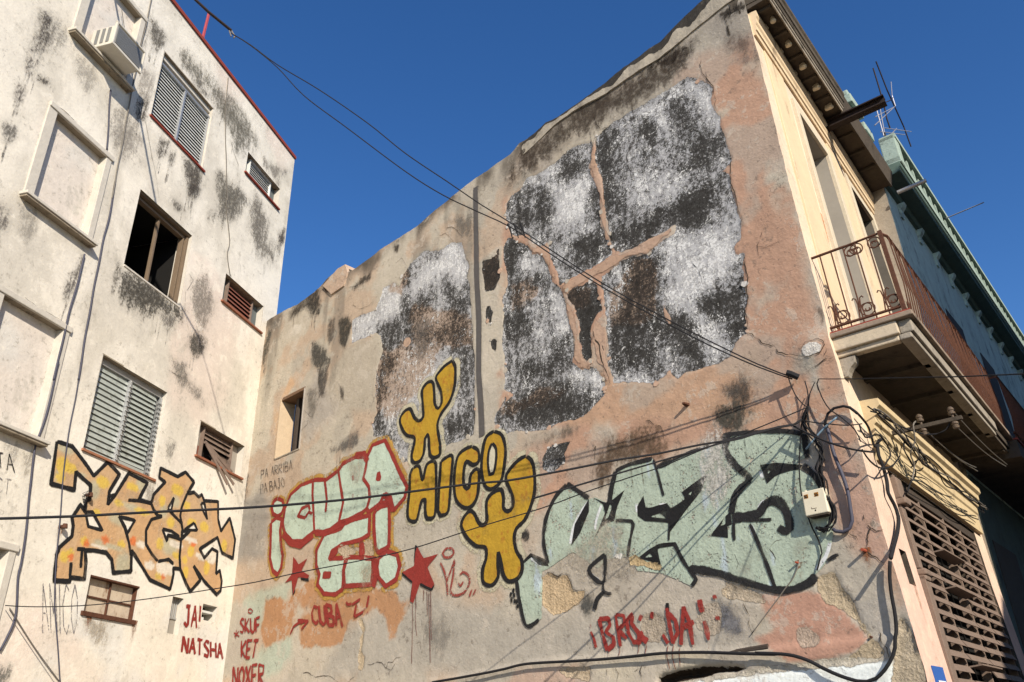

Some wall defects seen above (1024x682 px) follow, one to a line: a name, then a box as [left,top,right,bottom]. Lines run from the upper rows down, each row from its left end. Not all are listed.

damp [26,11,63,84]
damp [3,85,24,141]
damp [509,47,692,181]
damp [114,267,212,397]
damp [208,172,285,261]
damp [293,288,328,315]
damp [308,317,352,410]
peeling [352,242,476,463]
peeling [482,77,749,434]
damp [712,377,753,432]
spalling [541,522,662,615]
spalling [661,572,927,682]